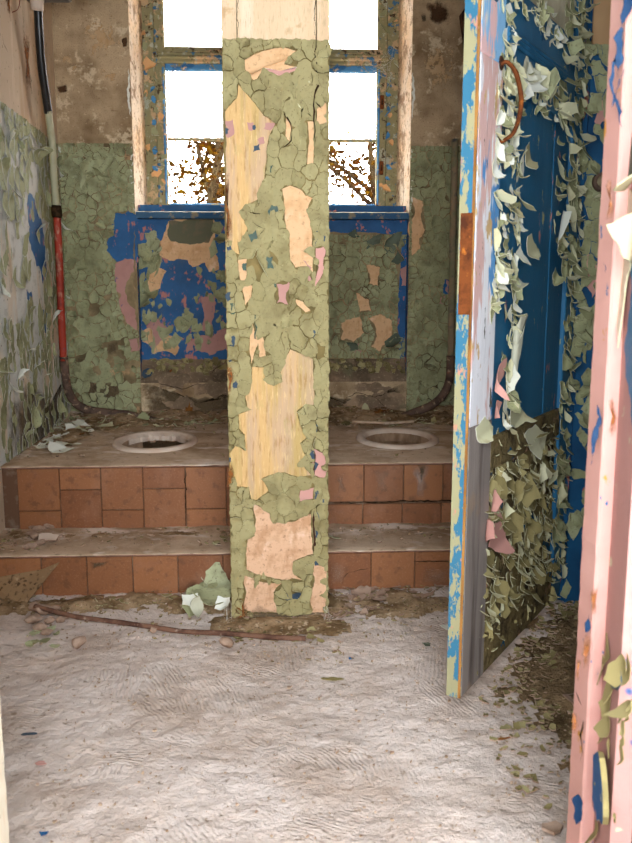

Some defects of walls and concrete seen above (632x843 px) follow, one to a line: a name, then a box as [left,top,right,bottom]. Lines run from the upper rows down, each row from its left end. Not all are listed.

peeling [245,48,297,80]
peeling [307,103,327,164]
damp [427,2,448,23]
peeling [0,85,310,469]
peeling [268,145,461,411]
peeling [475,0,632,652]
peeling [215,315,390,618]
peeling [593,633,632,765]